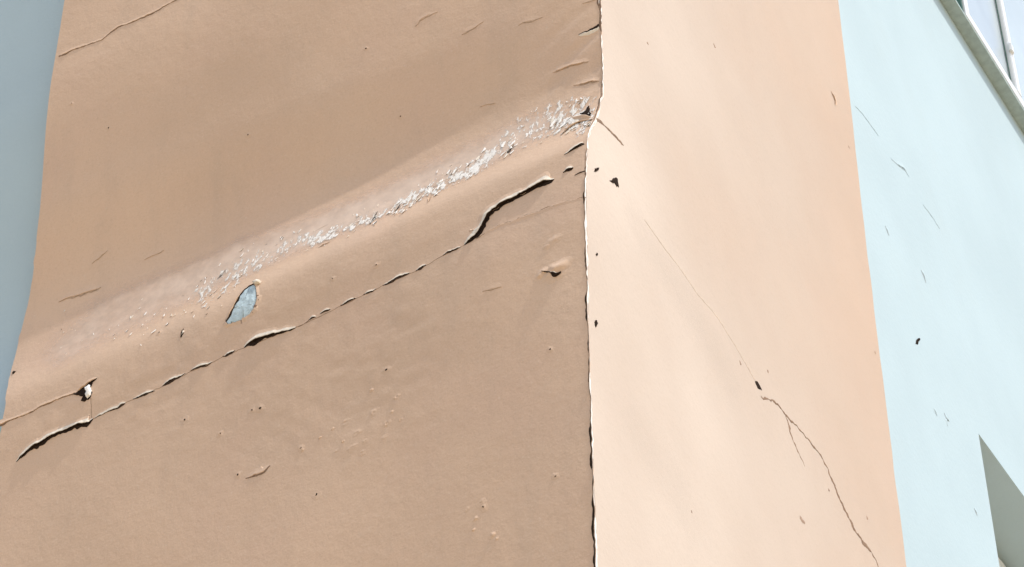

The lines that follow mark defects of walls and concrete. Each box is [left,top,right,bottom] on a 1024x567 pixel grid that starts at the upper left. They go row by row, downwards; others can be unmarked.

crack [59,0,176,57]
crack [0,118,624,462]
peeling [58,0,604,567]
crack [645,221,879,567]